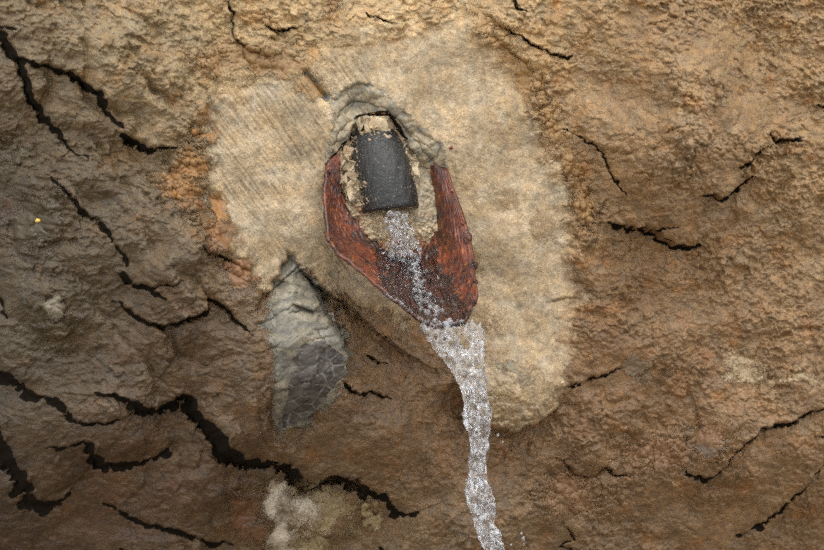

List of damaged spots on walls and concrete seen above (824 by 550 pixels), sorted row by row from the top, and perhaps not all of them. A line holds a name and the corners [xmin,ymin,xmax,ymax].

crack [263,22,299,33]
crack [0,26,177,159]
crack [354,110,408,140]
crack [563,129,627,195]
crack [703,132,802,203]
crack [46,174,254,336]
crack [608,222,701,251]
crack [0,371,419,519]
crack [685,409,824,484]
crack [102,503,234,549]
damp [219,474,387,550]
crack [736,465,824,538]